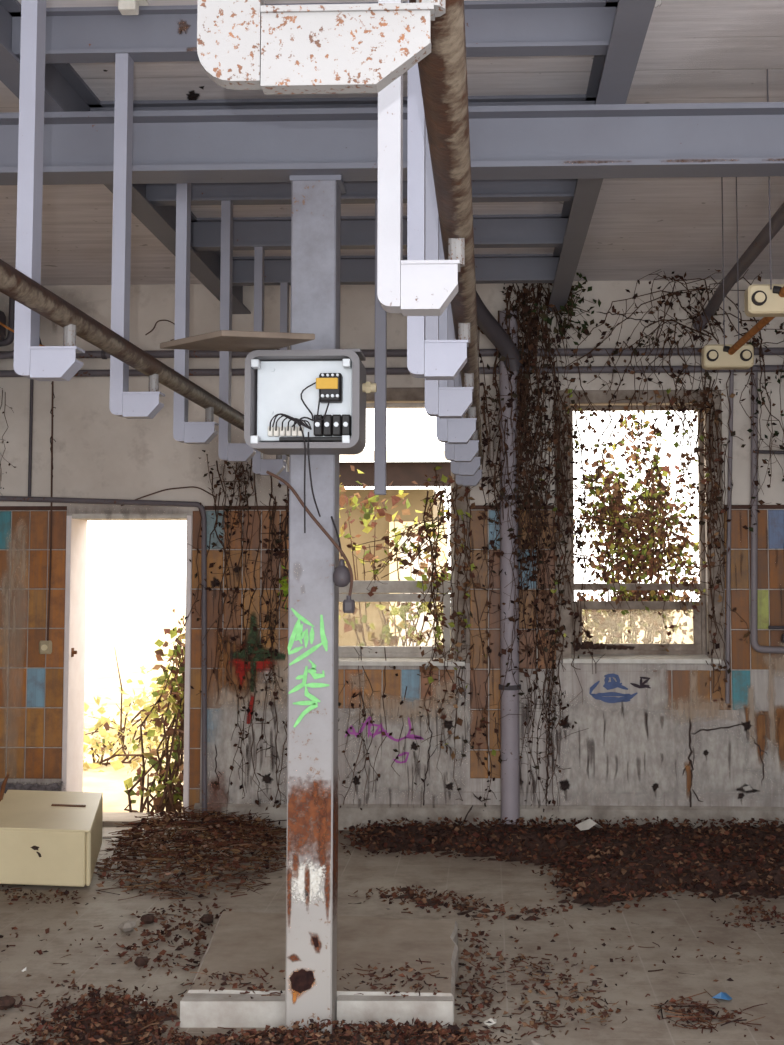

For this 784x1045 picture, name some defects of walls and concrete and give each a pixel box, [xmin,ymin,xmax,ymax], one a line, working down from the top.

peeling [560,668,725,796]
peeling [698,703,784,799]
corrosion [287,780,338,925]
corrosion [288,954,315,1003]
corrosion [311,935,321,953]